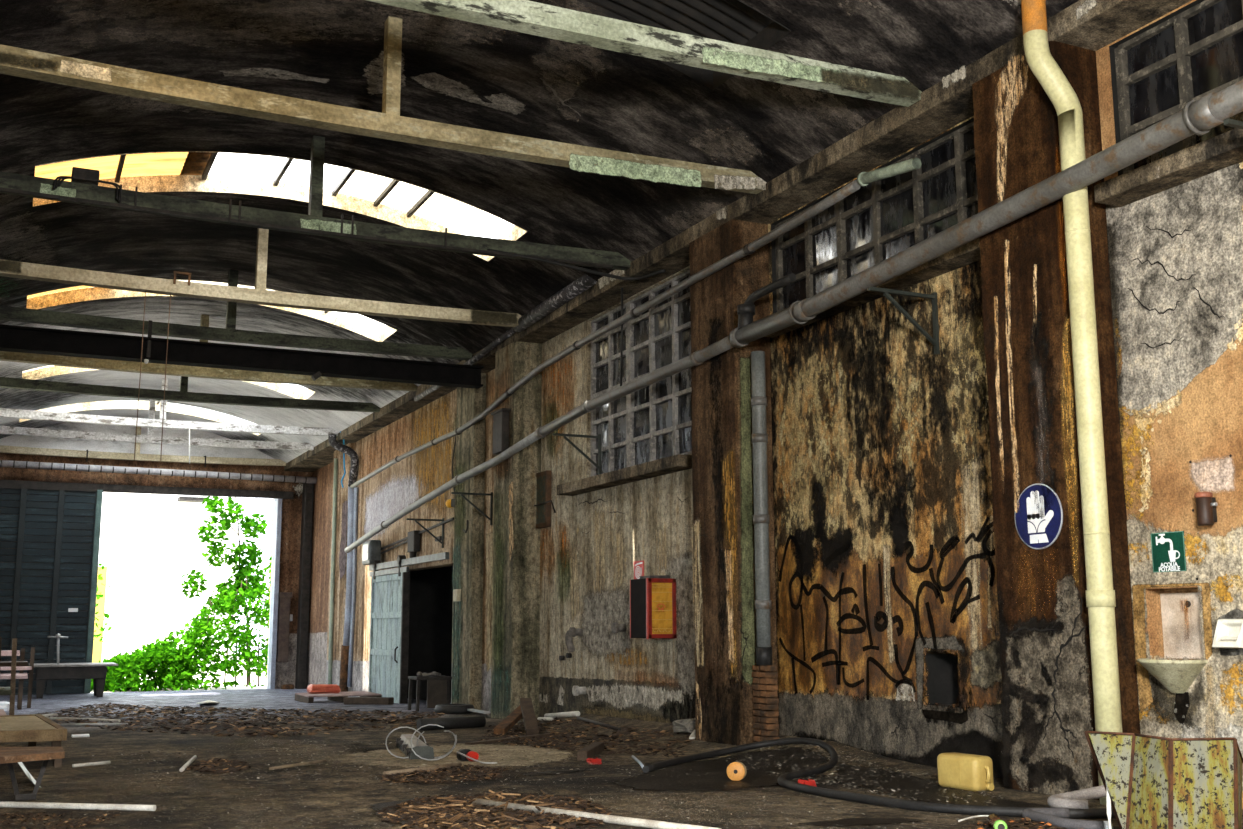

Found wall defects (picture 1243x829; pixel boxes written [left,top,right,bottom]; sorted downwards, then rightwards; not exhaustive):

peeling [52,0,526,117]
peeling [529,0,598,14]
peeling [531,39,607,121]
peeling [996,54,1028,201]
peeling [1076,0,1096,20]
damp [770,240,1079,791]
spalling [1106,161,1243,738]
spalling [896,573,1094,795]